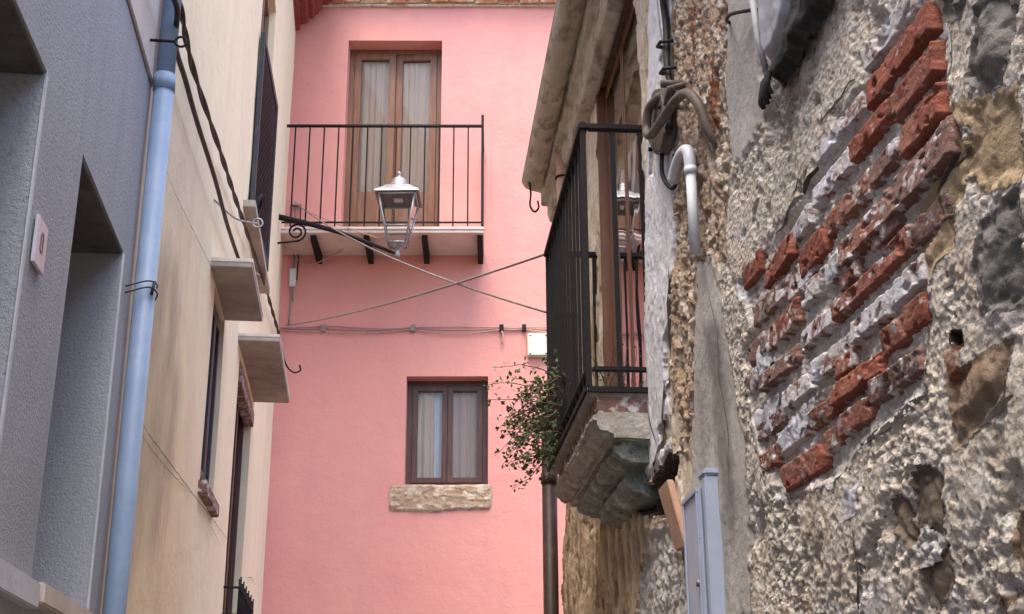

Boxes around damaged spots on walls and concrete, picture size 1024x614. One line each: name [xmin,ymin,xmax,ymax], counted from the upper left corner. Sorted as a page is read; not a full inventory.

crack [142,425,227,546]
spalling [561,0,732,614]
spalling [736,0,1024,502]
spalling [890,464,955,614]